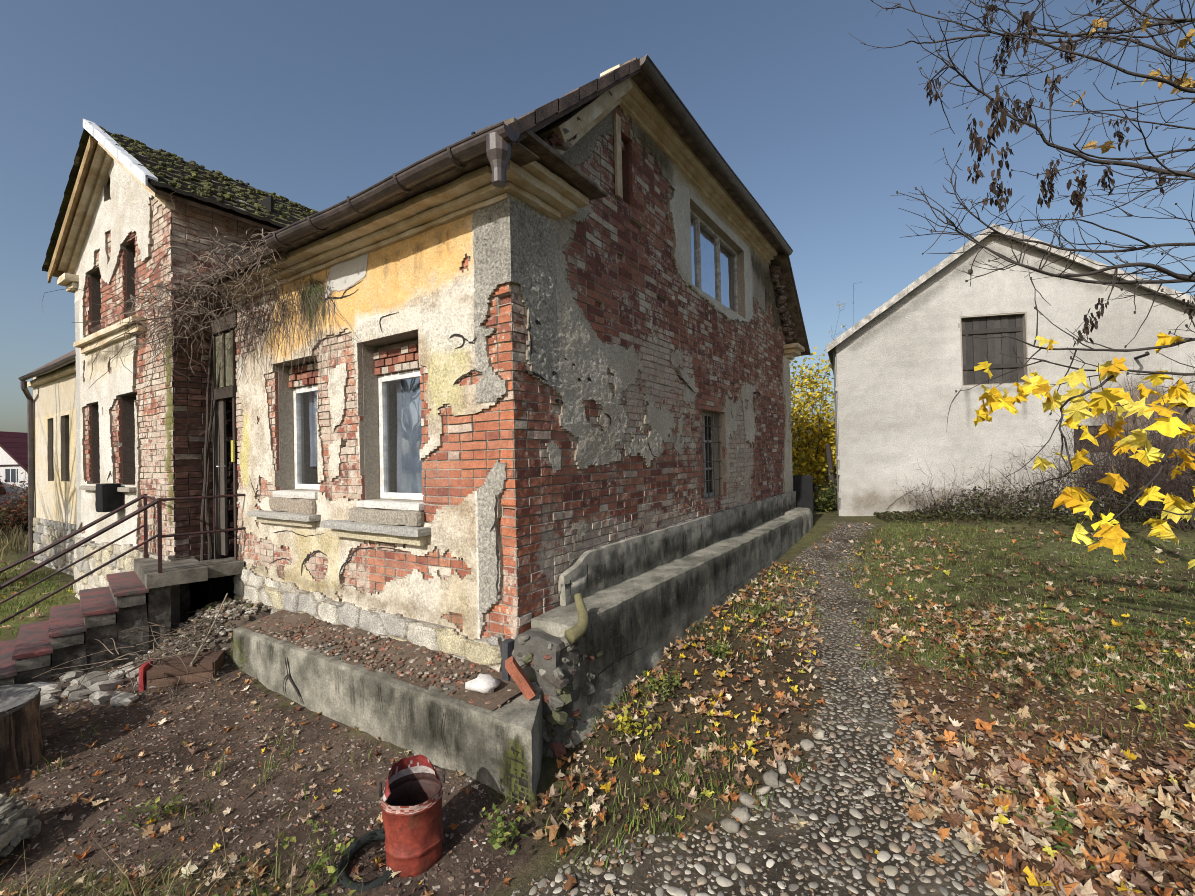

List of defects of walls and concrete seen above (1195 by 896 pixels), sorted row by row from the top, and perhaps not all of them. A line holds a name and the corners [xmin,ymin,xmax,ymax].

flaking render [84,197,471,598]
crack [283,657,302,703]
flaking render [420,105,791,641]
leakage [586,496,795,588]